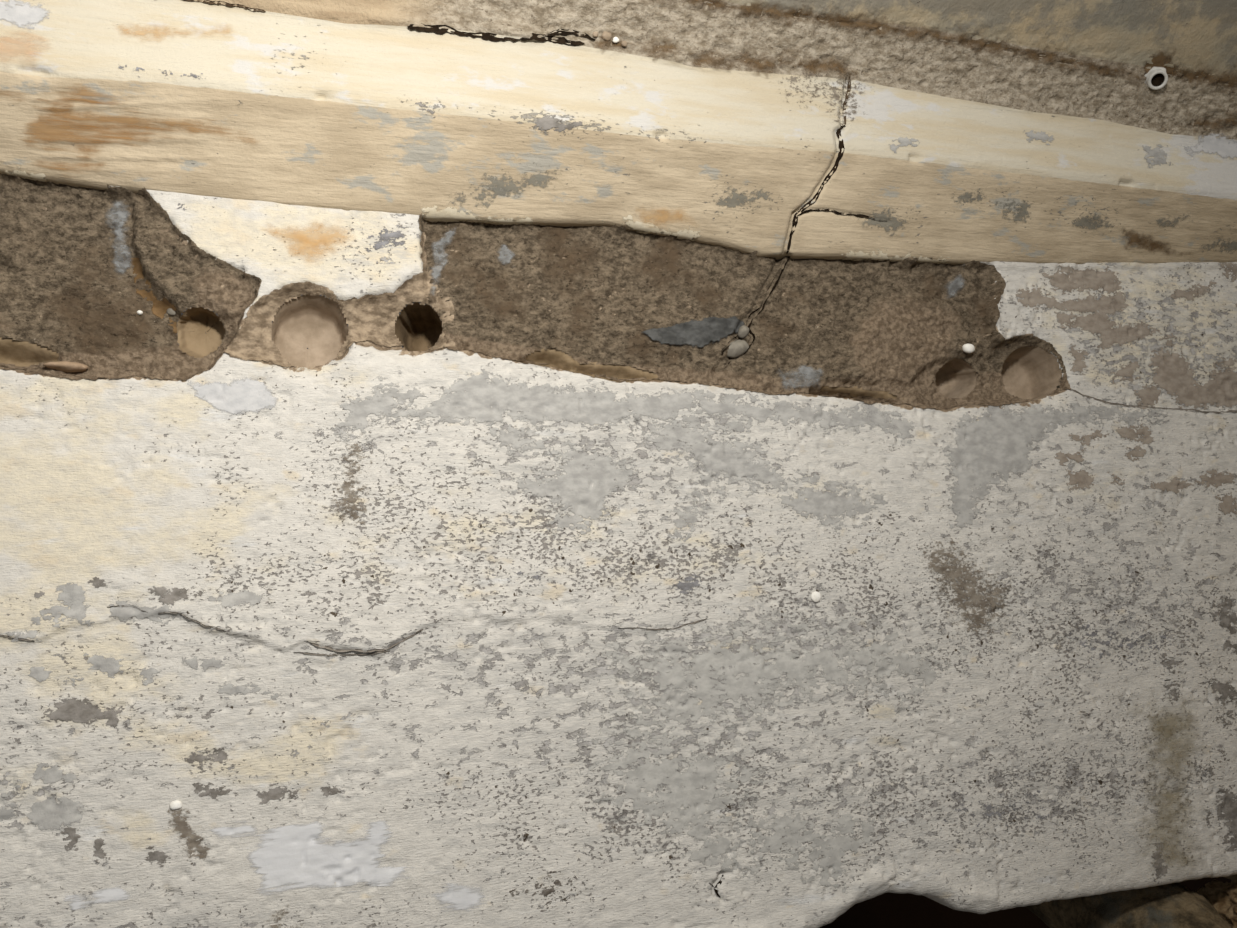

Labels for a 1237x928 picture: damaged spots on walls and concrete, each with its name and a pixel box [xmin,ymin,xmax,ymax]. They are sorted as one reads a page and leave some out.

crack [408,23,596,46]
peeling [889,137,919,153]
peeling [1142,144,1171,168]
peeling [1185,134,1237,160]
crack [721,76,880,365]
spalling [0,167,1237,541]
crack [110,605,223,630]
crack [294,629,423,656]